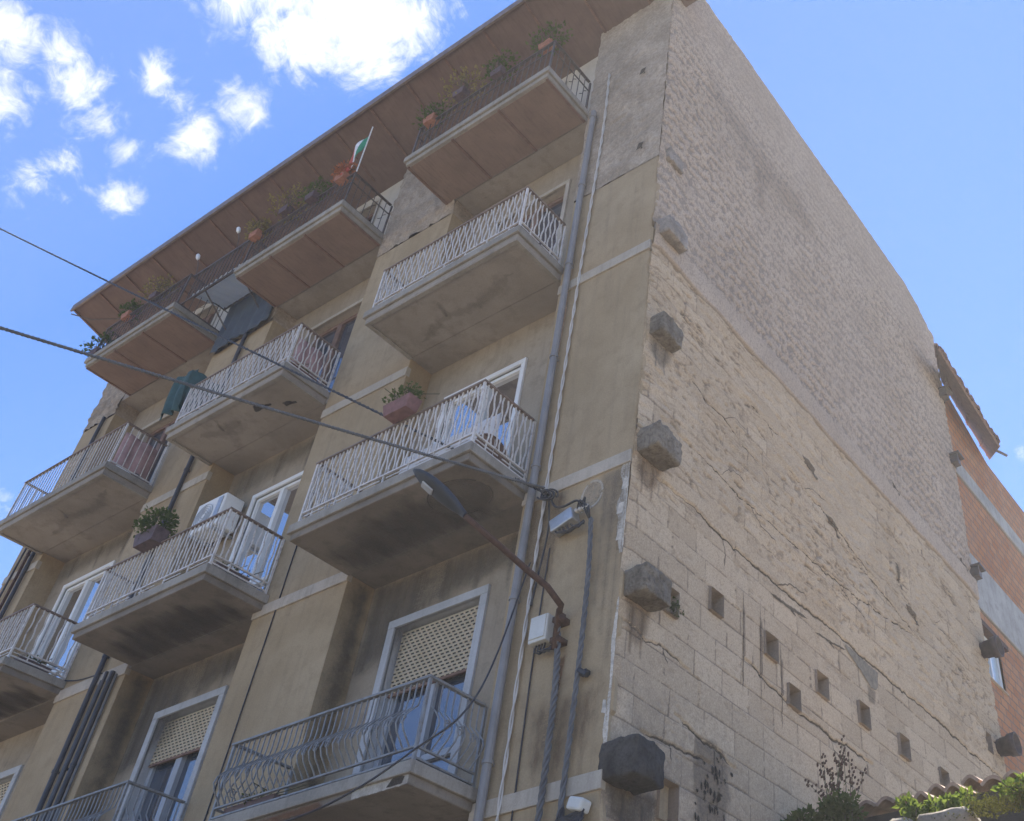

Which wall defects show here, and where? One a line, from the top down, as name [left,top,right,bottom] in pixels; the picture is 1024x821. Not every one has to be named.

crack [631,627,679,663]
crack [695,385,945,635]
crack [648,482,1000,777]
mould [694,755,733,821]